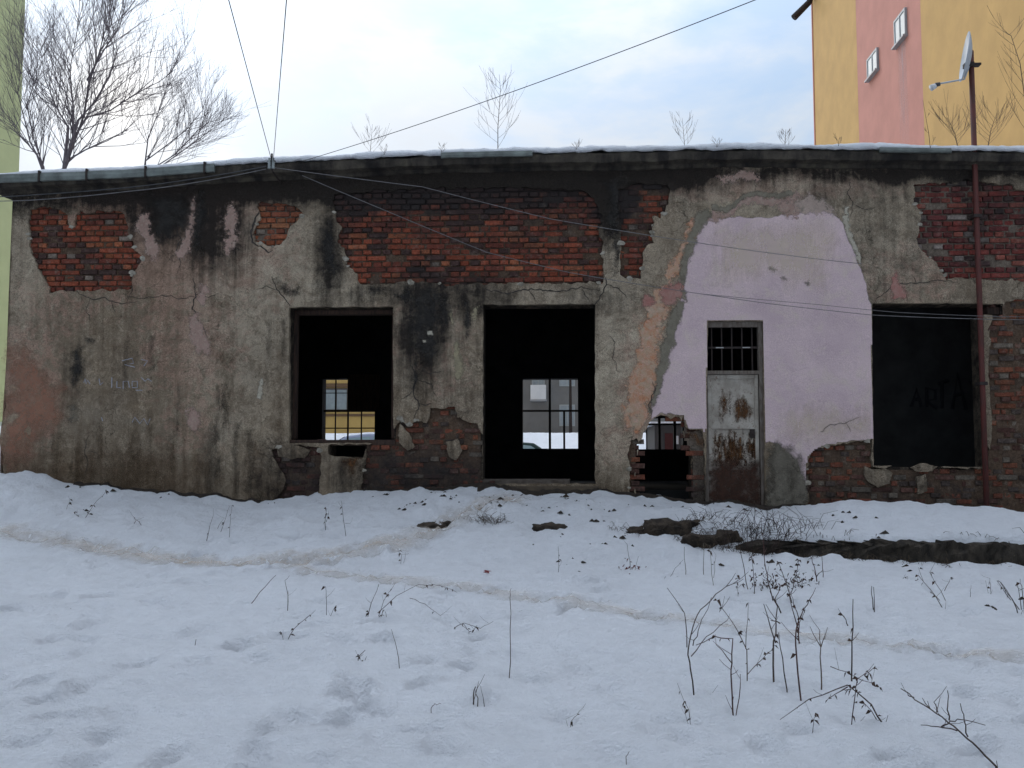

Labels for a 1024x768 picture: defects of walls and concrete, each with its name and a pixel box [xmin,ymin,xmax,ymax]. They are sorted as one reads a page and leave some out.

spalling [25,207,160,293]
leakage [145,191,208,250]
spalling [254,202,305,248]
spalling [332,187,605,286]
peeling [617,170,1024,512]
spalling [273,439,326,500]
spalling [343,407,495,490]
rust [689,394,761,505]